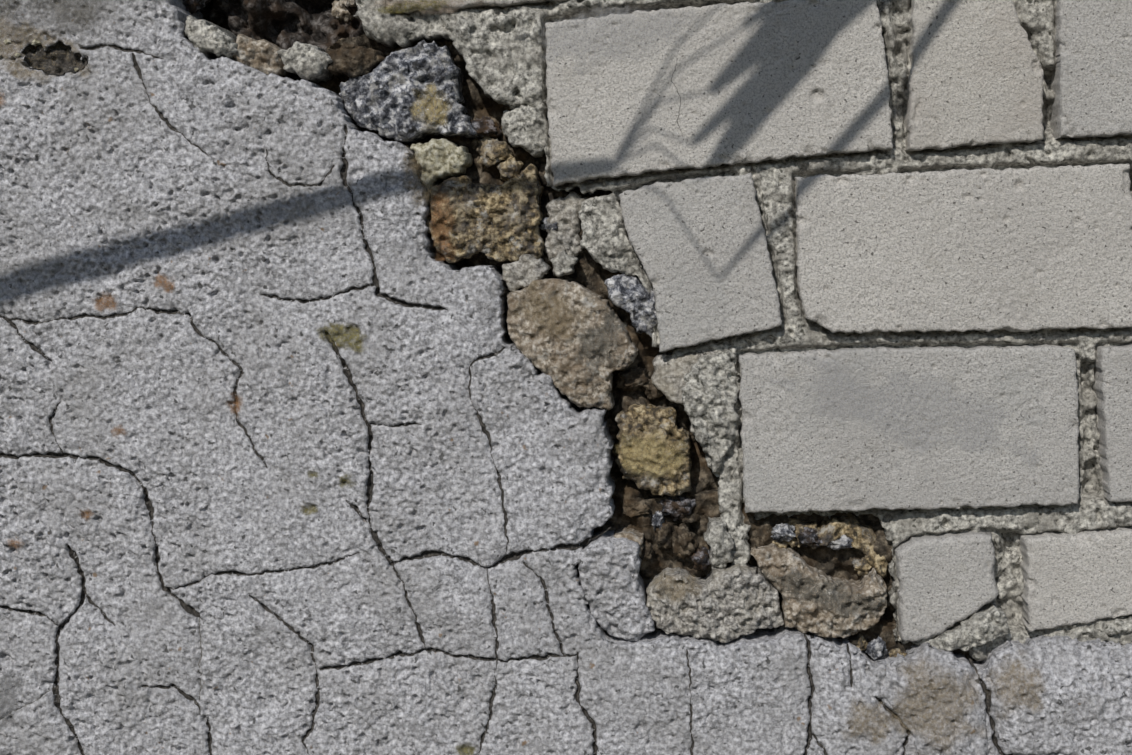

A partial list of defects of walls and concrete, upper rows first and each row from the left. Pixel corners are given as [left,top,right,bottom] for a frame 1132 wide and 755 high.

crack [80,44,209,156]
spalling [318,75,349,97]
crack [671,58,683,134]
crack [261,125,447,310]
spalling [326,34,722,597]
crack [0,307,267,468]
crack [0,332,611,755]
spalling [741,503,916,660]
crack [686,649,694,755]
crack [803,634,827,755]
crack [846,644,911,755]
crack [968,656,1013,755]